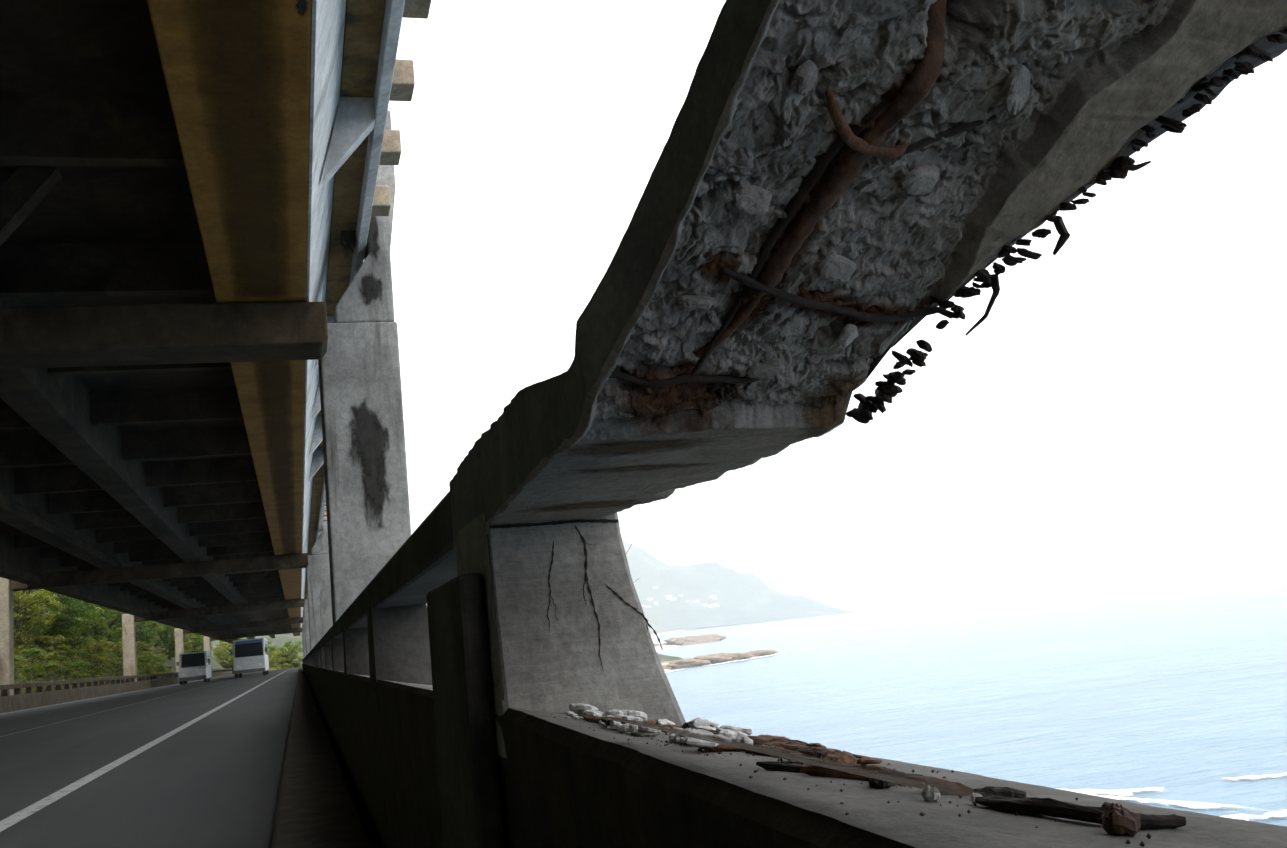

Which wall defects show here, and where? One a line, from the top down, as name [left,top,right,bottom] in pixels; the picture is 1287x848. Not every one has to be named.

rust [699,52,942,331]
spalling [575,0,1287,443]
rust [618,363,740,436]
crack [489,519,665,671]